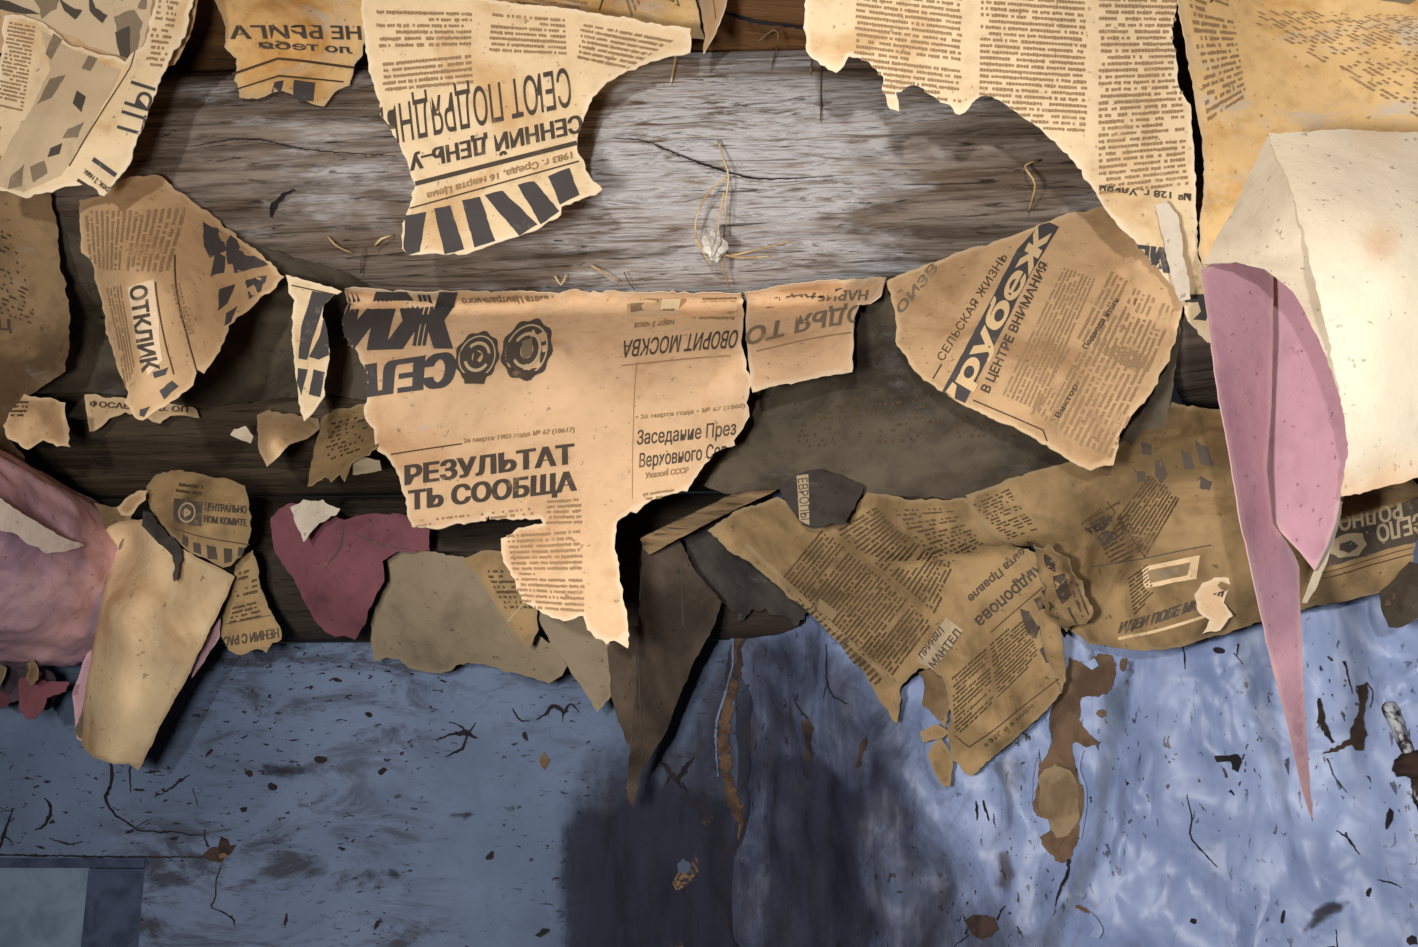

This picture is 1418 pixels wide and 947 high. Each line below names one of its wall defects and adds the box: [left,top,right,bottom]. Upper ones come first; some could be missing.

peeling [1155,201,1190,301]
spalling [539,751,550,770]
spalling [801,715,814,762]
spalling [855,737,867,768]
spalling [1214,754,1242,772]
water stain [564,636,1006,947]
water stain [1001,855,1011,886]